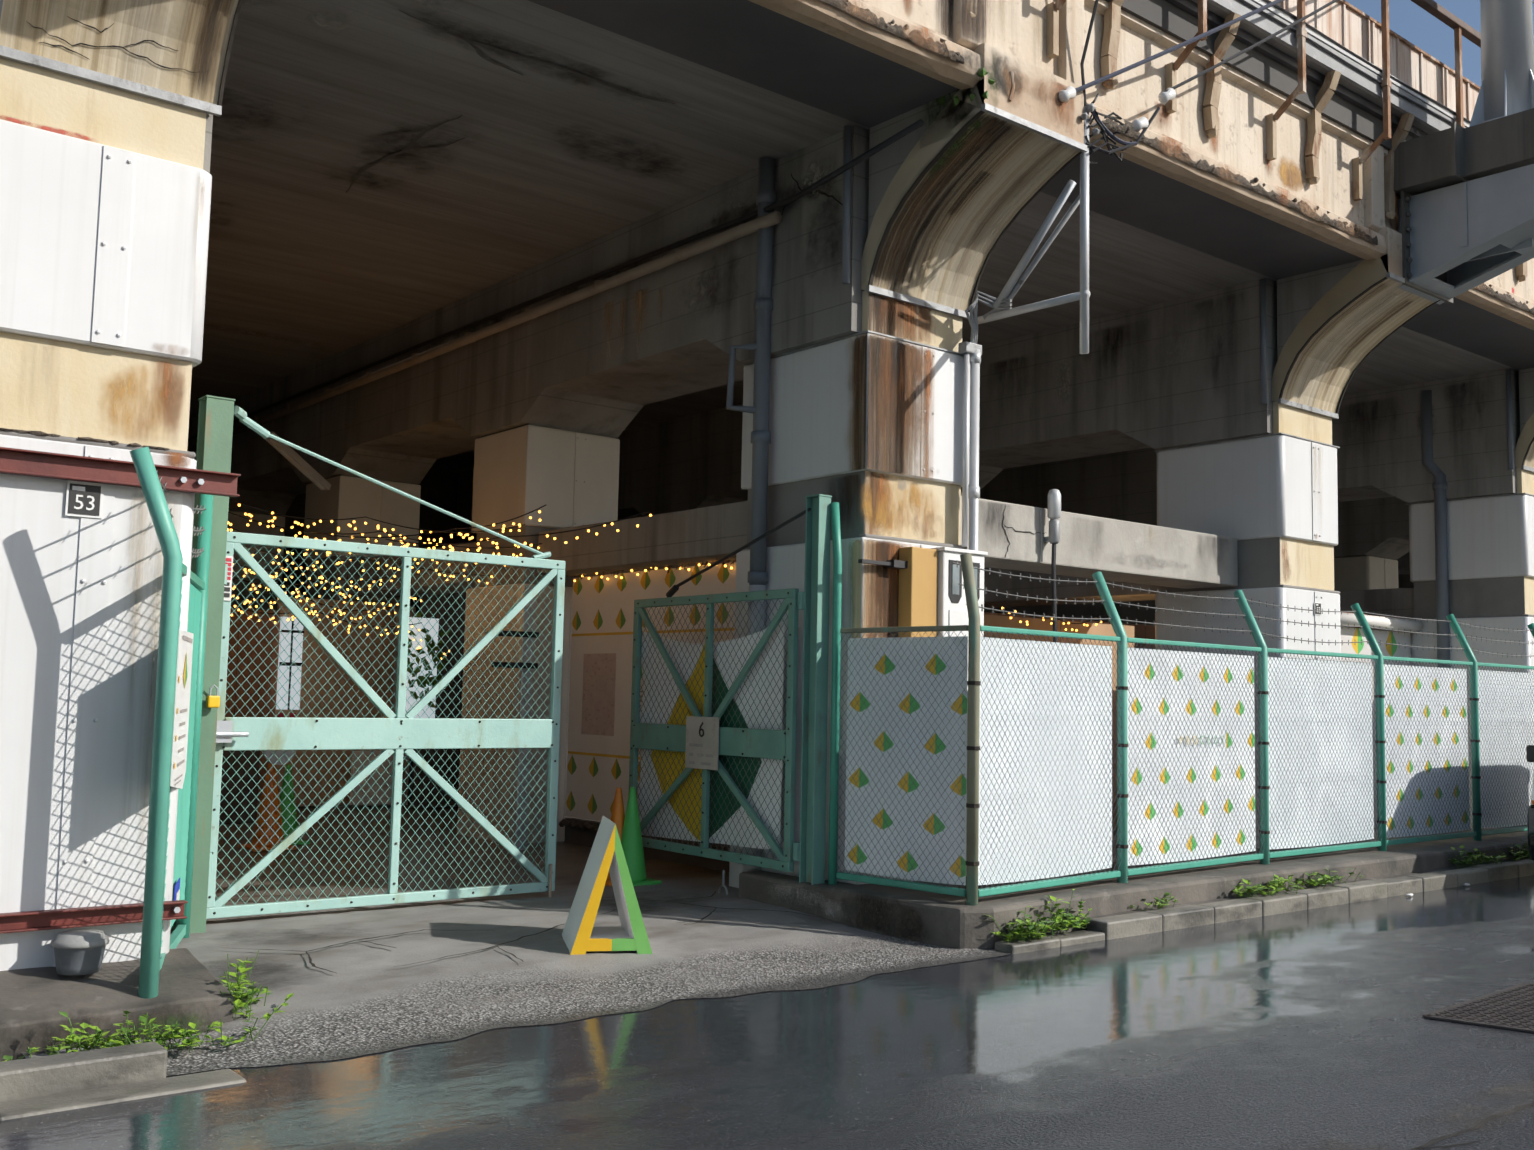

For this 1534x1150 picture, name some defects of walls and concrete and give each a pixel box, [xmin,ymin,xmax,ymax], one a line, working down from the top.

crack [28,16,195,73]
water stain [185,0,231,87]
spalling [821,0,965,64]
water stain [876,118,1028,286]
spalling [1102,118,1378,245]
spalling [1474,283,1534,314]
corrosion [852,293,932,478]
corrosion [851,540,902,638]
crack [1411,1088,1534,1150]